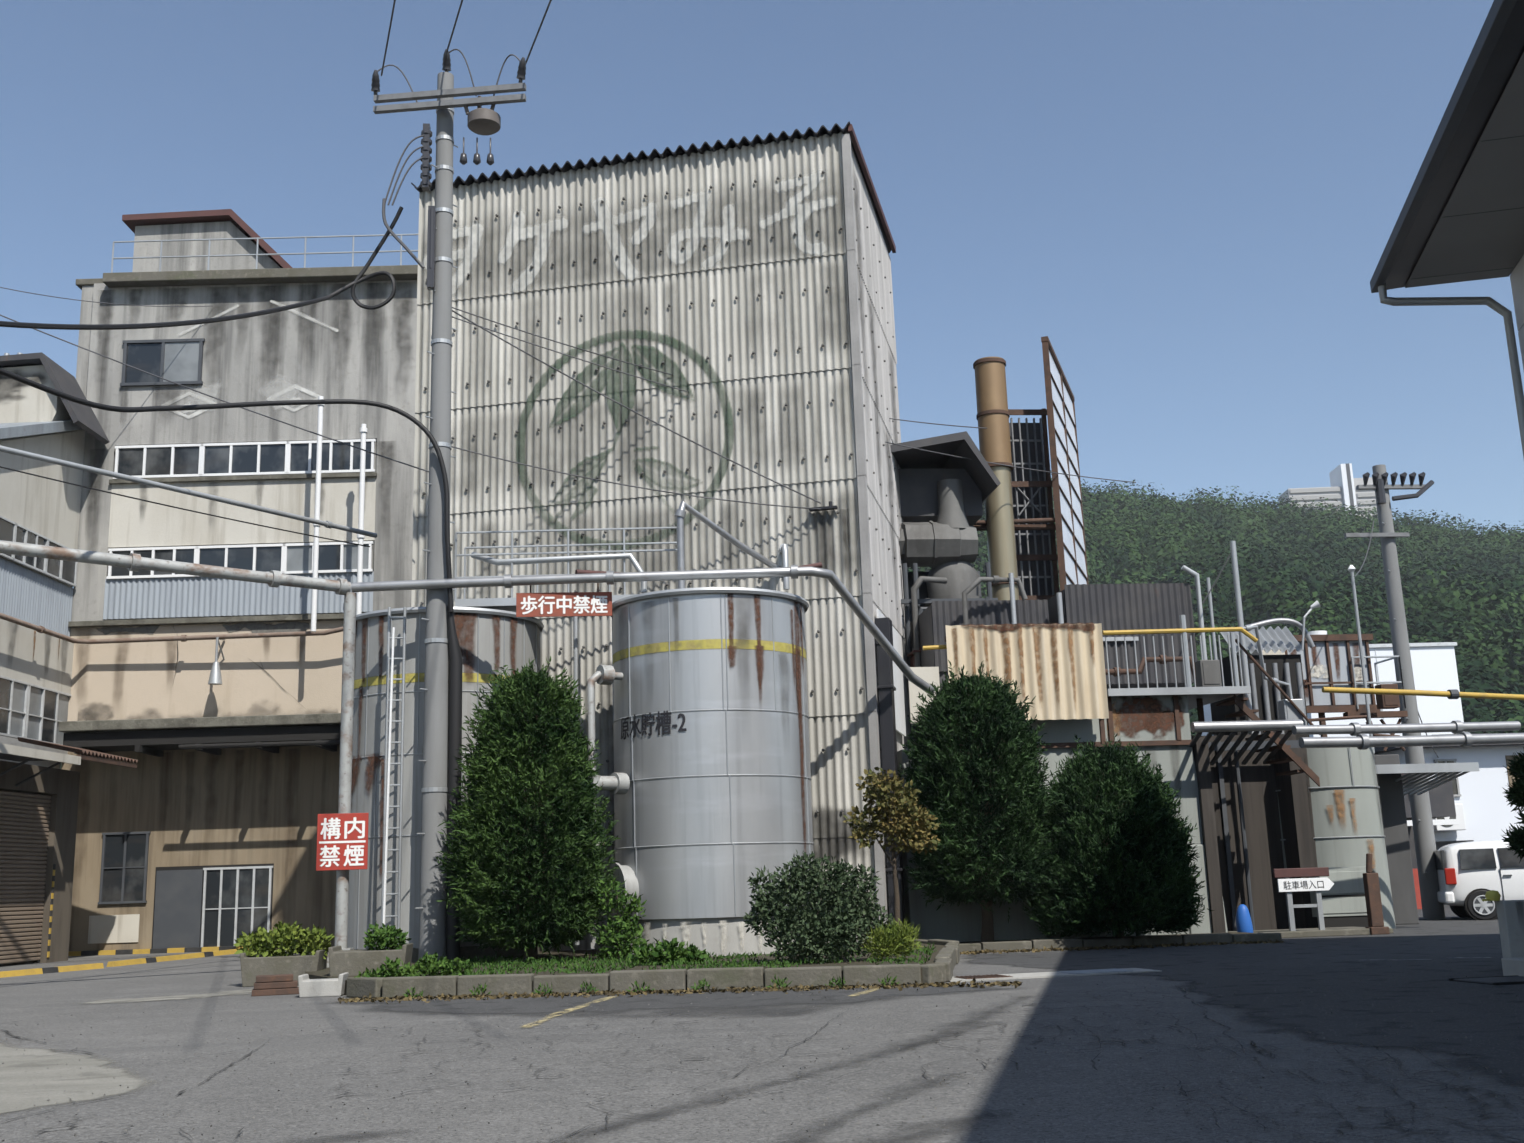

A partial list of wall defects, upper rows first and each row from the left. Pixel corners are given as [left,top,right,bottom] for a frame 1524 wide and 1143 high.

damp [581,219,602,276]
damp [841,284,873,337]
damp [817,498,850,567]
corrosion [454,613,517,679]
corrosion [728,593,736,666]
corrosion [754,594,764,693]
corrosion [952,622,1095,699]
corrosion [351,616,385,874]
corrosion [791,601,806,848]
corrosion [1107,696,1184,737]
corrosion [1327,790,1375,870]
crack [922,987,1353,1130]